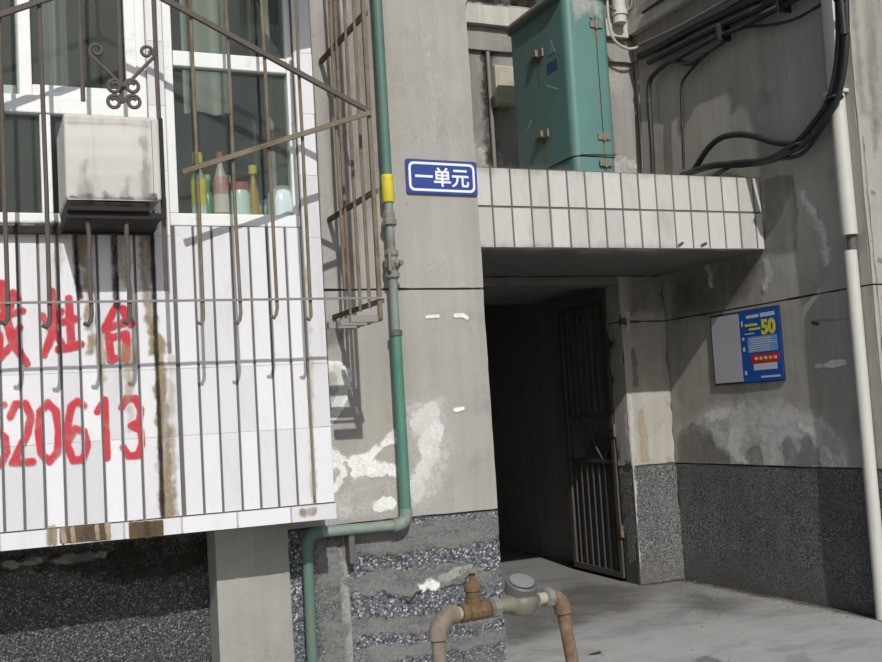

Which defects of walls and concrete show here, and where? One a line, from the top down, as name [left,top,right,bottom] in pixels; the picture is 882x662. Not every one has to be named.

corrosion [140,235,175,519]
efflorescence [327,361,353,424]
efflorescence [332,429,398,519]
efflorescence [407,399,448,507]
efflorescence [692,400,851,467]